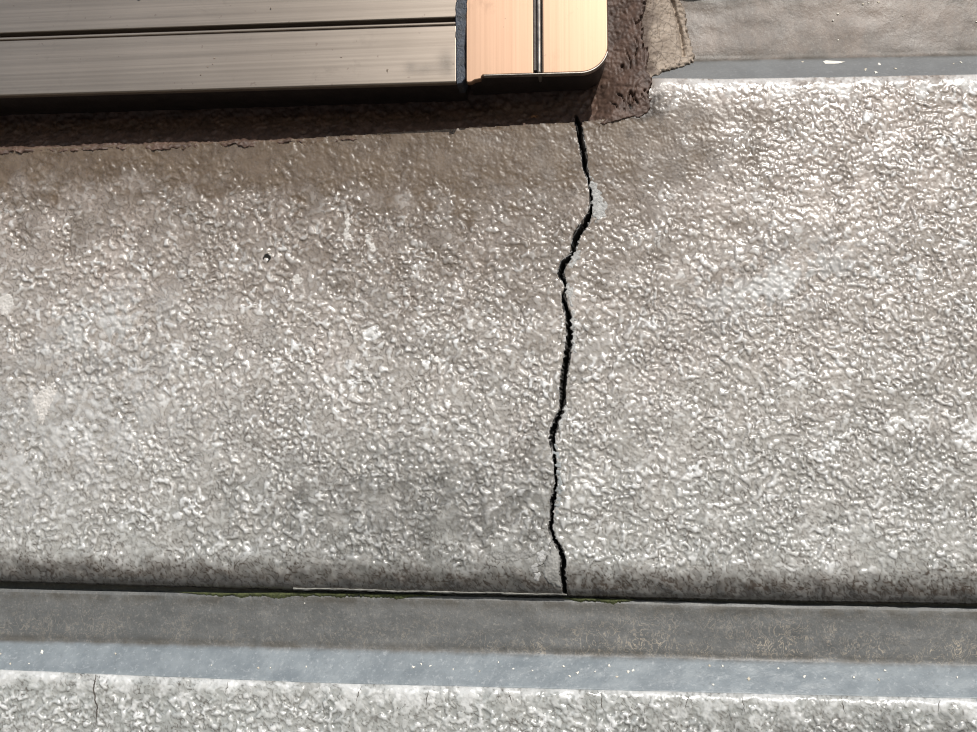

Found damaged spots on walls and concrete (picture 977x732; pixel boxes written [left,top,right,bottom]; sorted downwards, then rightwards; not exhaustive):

crack [536,116,608,595]